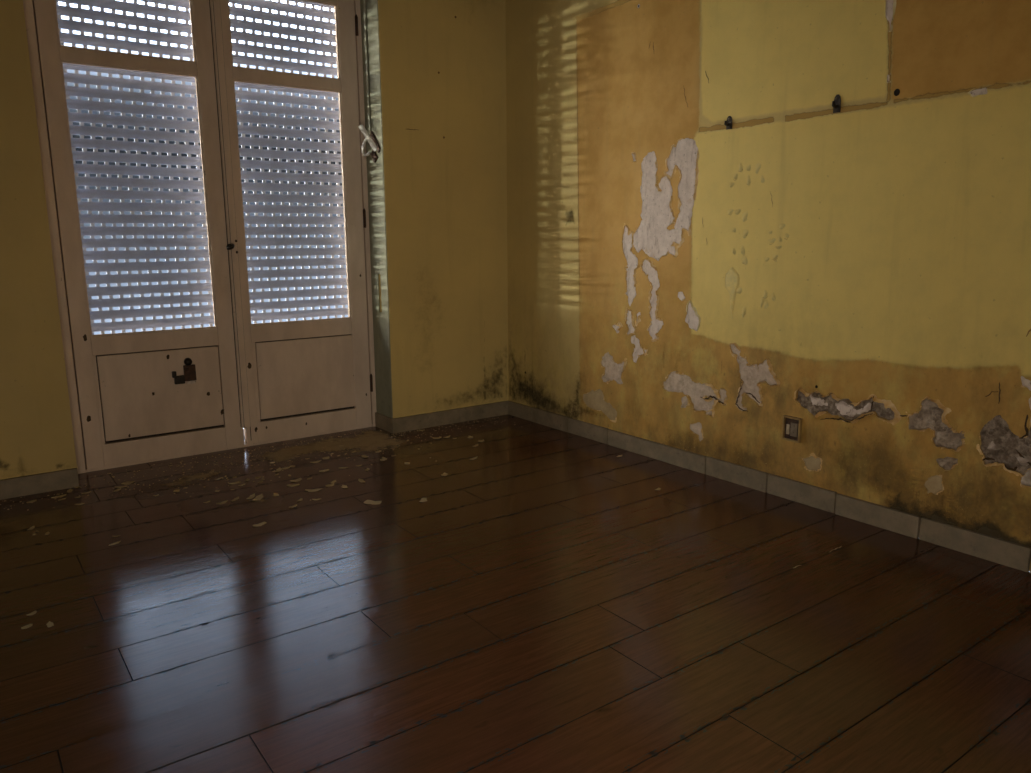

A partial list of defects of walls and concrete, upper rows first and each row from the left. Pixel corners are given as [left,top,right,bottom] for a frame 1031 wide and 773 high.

peeling [583,138,701,423]
damp [512,373,579,418]
peeling [662,343,780,441]
spalling [793,376,1031,495]
damp [888,488,1031,547]